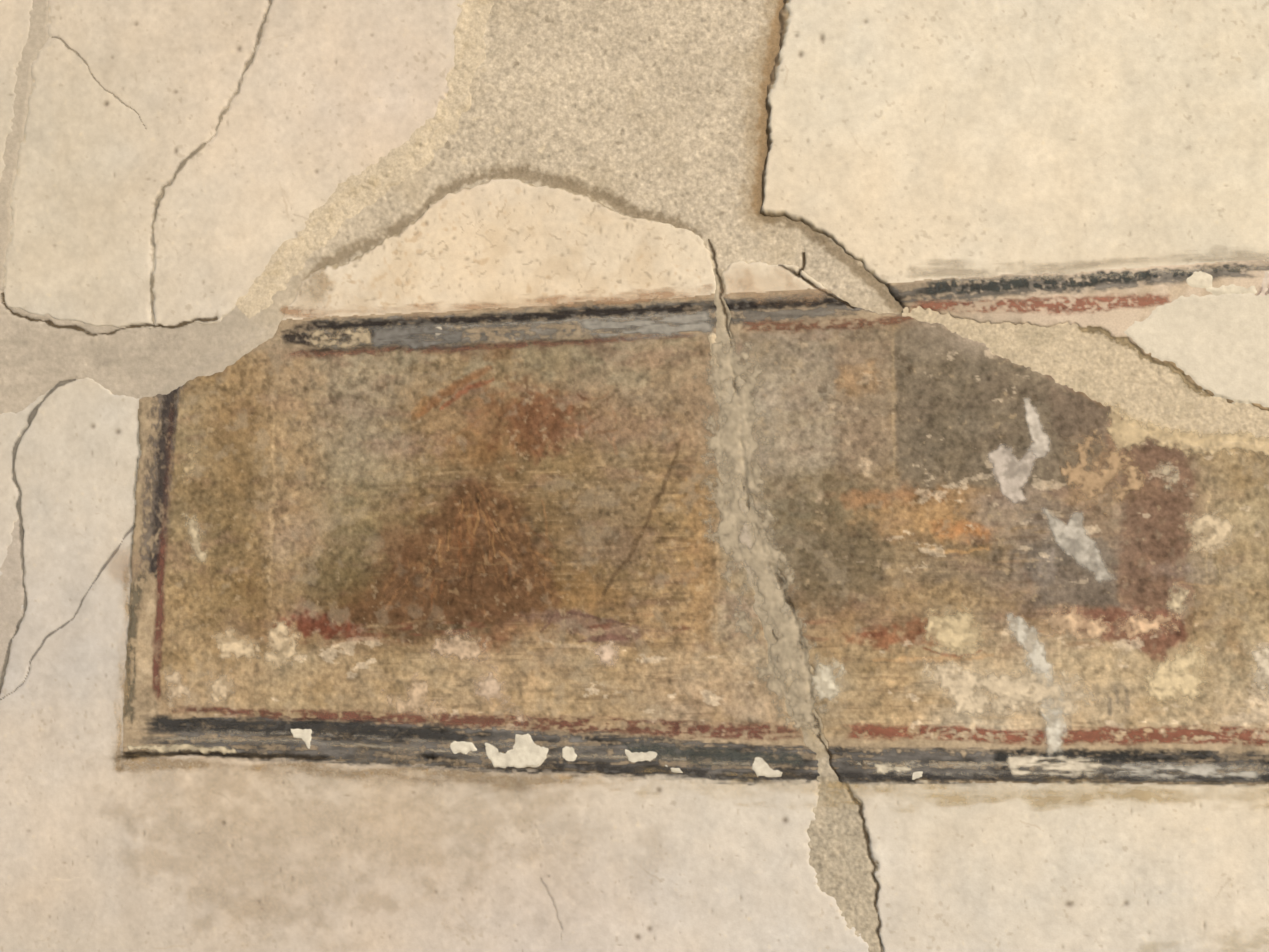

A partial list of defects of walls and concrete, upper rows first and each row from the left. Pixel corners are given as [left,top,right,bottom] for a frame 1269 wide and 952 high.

crack [52,37,145,126]
crack [152,0,272,235]
spalling [0,0,1269,455]
crack [1,274,218,336]
crack [0,379,134,700]
crack [705,239,884,952]
peeling [450,733,577,769]
peeling [625,749,683,773]
peeling [752,757,782,777]